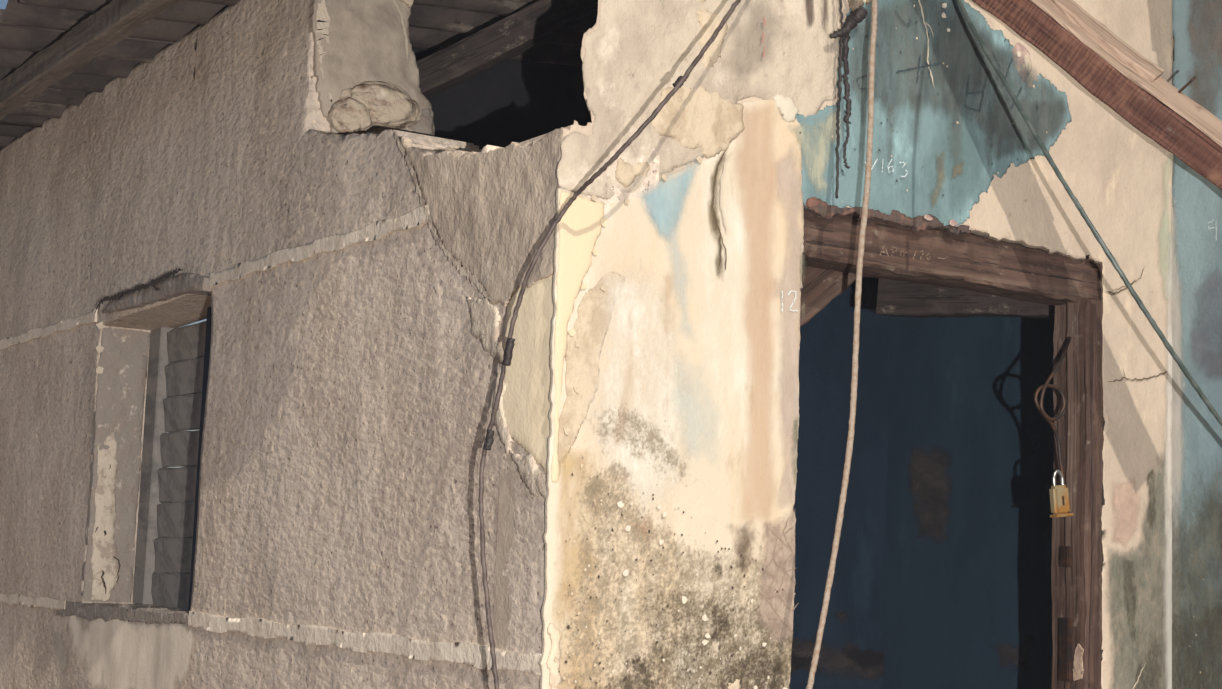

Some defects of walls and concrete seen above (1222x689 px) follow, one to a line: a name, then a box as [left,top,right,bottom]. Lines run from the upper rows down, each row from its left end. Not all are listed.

spalling [1012,43,1032,74]
damp [1189,0,1222,113]
spalling [90,428,120,601]
peeling [52,605,194,689]
damp [603,413,683,474]
damp [559,463,792,689]
spalling [393,0,971,689]
damp [1110,157,1222,689]